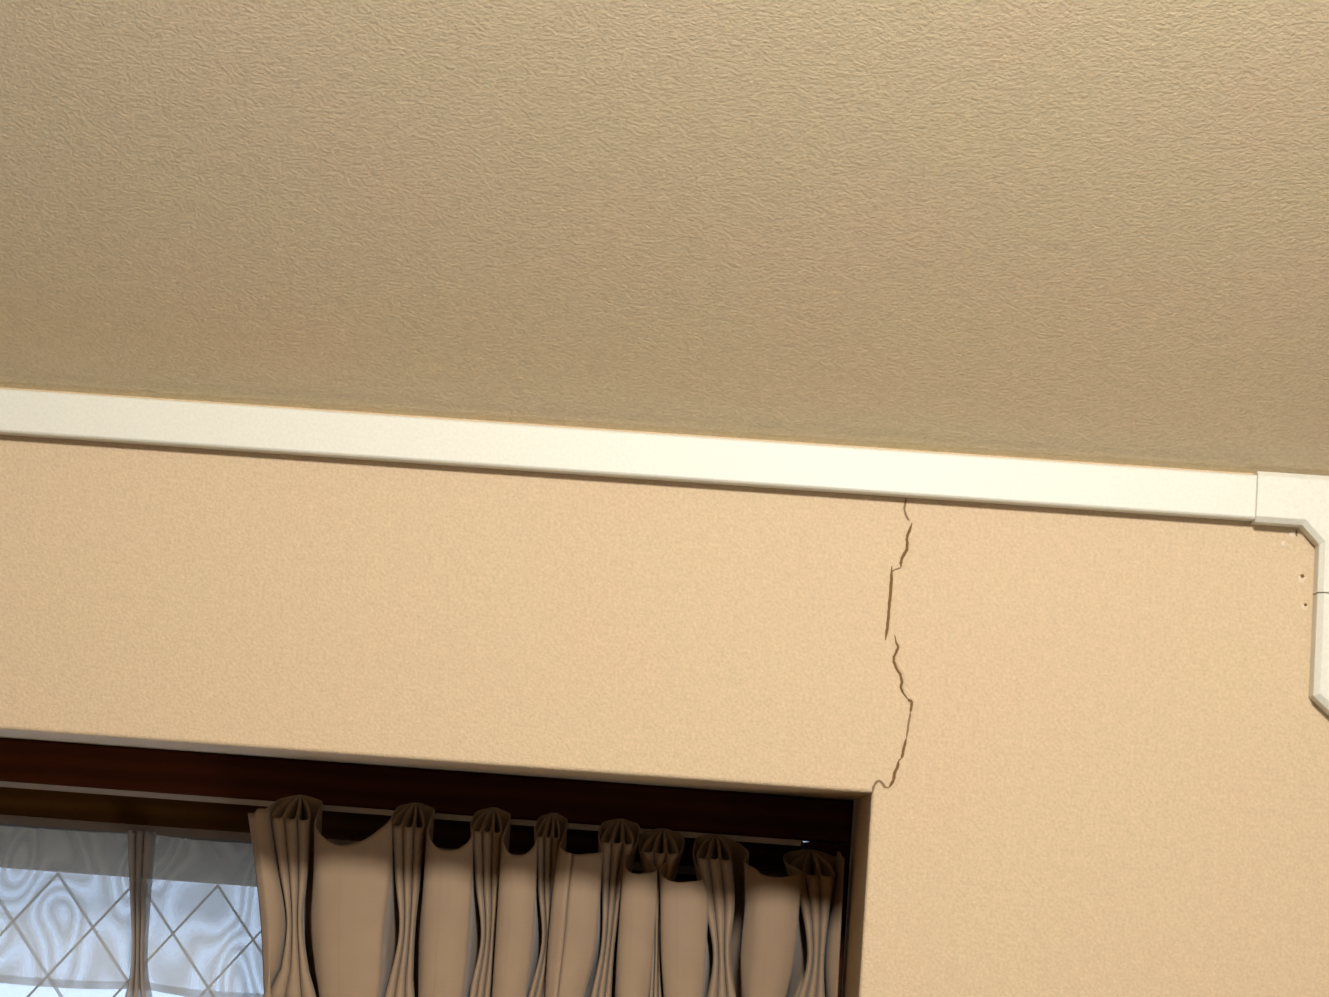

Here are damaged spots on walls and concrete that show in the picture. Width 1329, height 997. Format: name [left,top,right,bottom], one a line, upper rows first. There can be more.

crack [872,498,918,792]